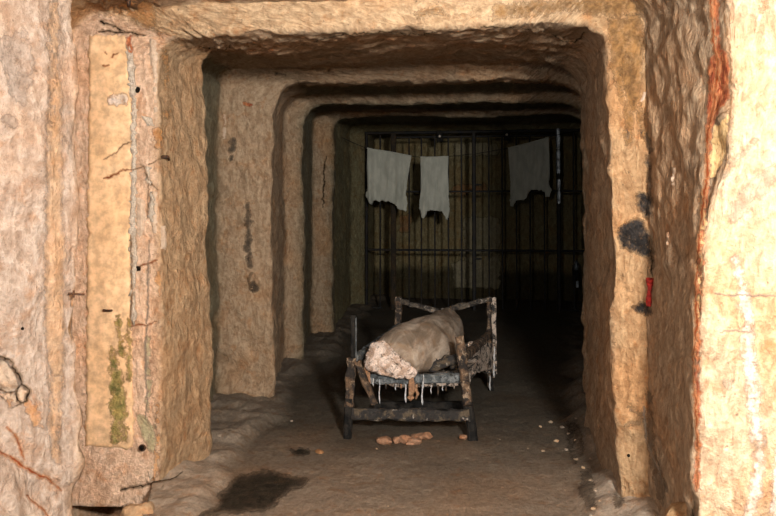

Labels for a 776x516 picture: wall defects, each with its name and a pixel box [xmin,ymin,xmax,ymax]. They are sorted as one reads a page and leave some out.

corrosion [704,0,733,163]
crack [692,0,733,516]
crack [0,356,30,405]
damp [114,315,133,382]
corrosion [692,177,711,492]
crack [0,426,61,490]
damp [199,469,309,516]